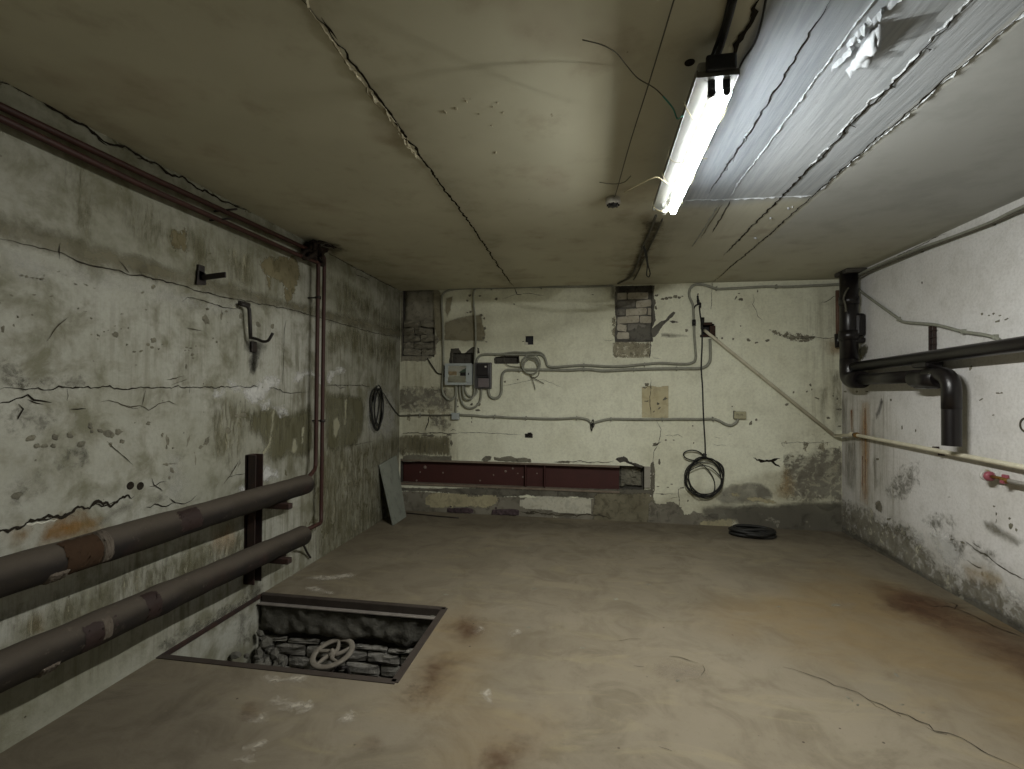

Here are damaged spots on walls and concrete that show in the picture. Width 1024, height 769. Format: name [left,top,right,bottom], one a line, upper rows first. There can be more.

crack [0,82,248,211]
crack [302,0,536,297]
crack [3,239,400,338]
peeling [612,285,683,358]
crack [0,480,197,533]
crack [1,363,304,419]
damp [214,376,313,481]
damp [296,367,451,555]
peeling [402,491,595,520]
damp [703,472,1024,634]
crack [785,667,1021,769]